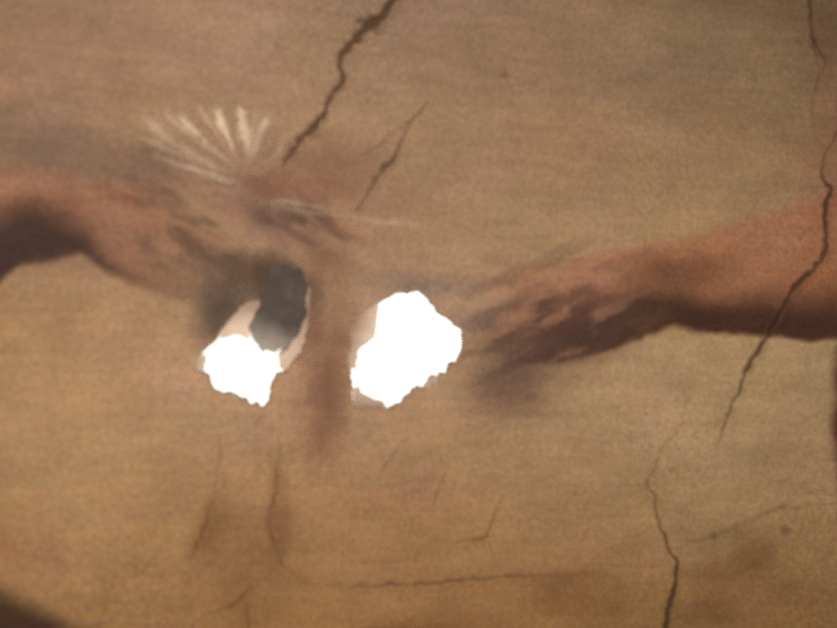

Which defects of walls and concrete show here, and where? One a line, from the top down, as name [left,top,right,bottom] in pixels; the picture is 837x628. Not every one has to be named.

crack [288,0,396,158]
crack [740,175,833,391]
peeling [218,300,260,340]
peeling [278,286,311,371]
peeling [348,303,379,369]
peeling [352,386,387,409]
peeling [424,375,438,390]
crack [664,556,678,628]